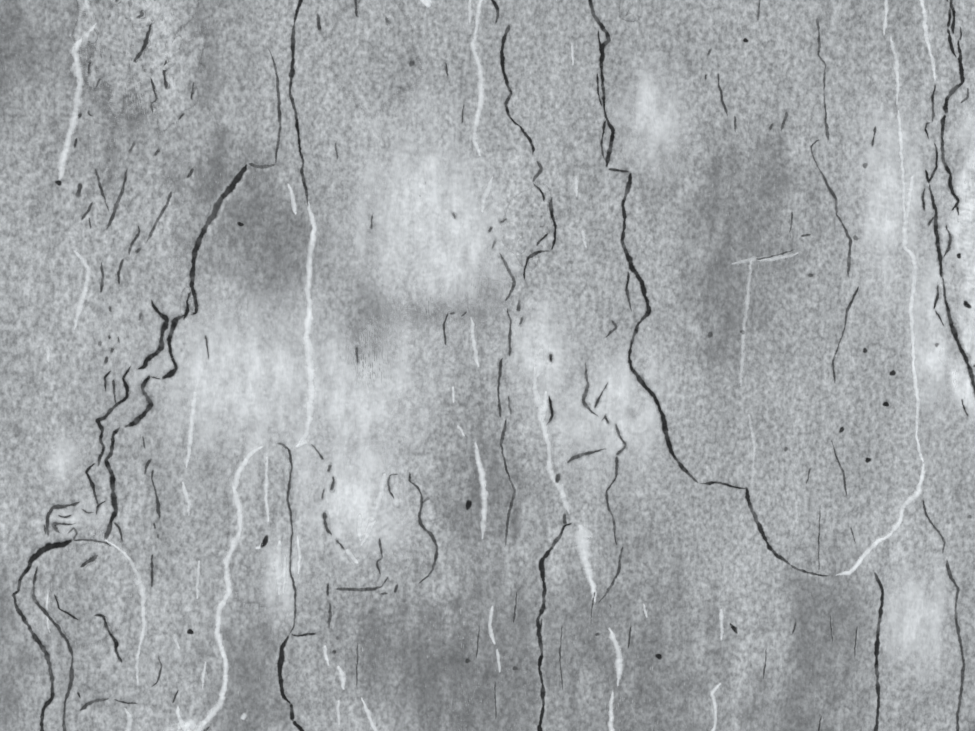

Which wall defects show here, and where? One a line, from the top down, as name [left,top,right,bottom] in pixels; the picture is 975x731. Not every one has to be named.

crack [13,0,321,731]
crack [277,443,438,731]
crack [491,0,557,536]
crack [513,514,571,731]
crack [555,369,626,636]
crack [588,0,828,576]
crack [810,23,859,382]
crack [832,443,847,495]
crack [830,573,884,731]
crack [923,500,965,731]
crack [922,0,975,416]